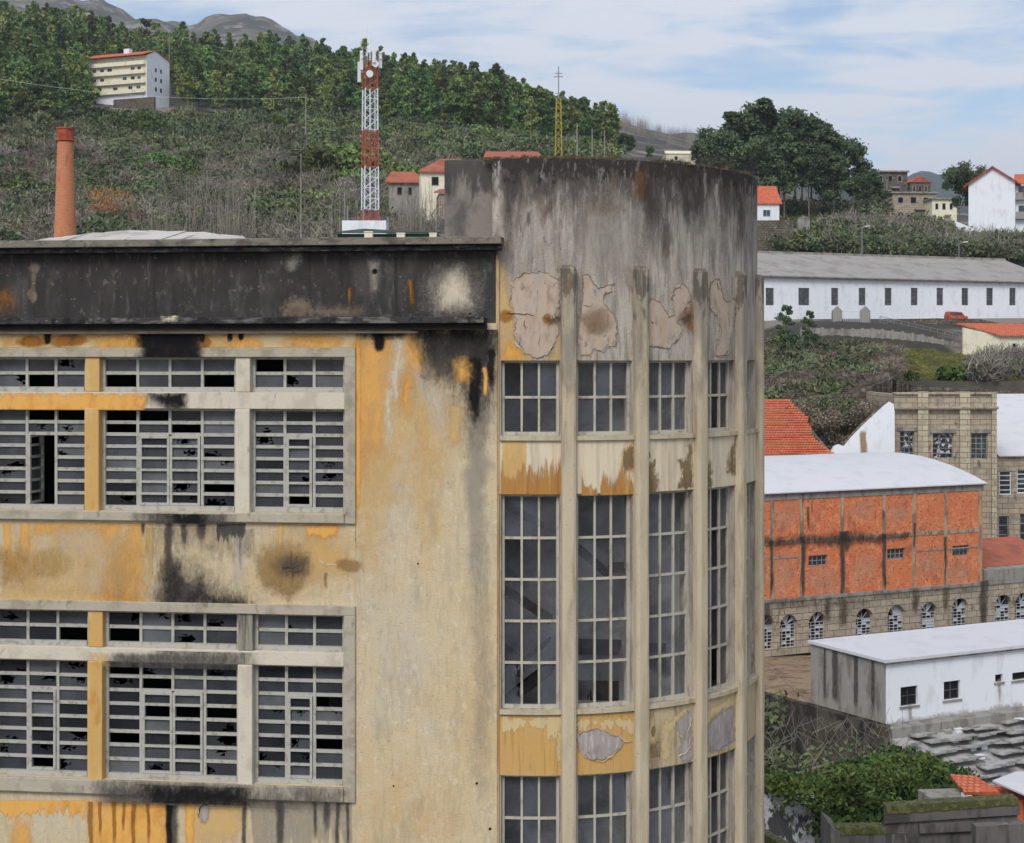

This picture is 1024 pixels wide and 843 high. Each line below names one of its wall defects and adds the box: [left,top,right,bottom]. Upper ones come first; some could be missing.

damp [703,173,718,208]
spalling [462,271,561,361]
spalling [576,274,618,356]
damp [356,333,405,434]
damp [418,349,495,420]
peeling [500,442,561,494]
peeling [582,442,634,495]
peeling [677,444,693,490]
damp [141,513,245,597]
spalling [577,717,634,762]
damp [101,782,297,843]
damp [310,798,349,843]